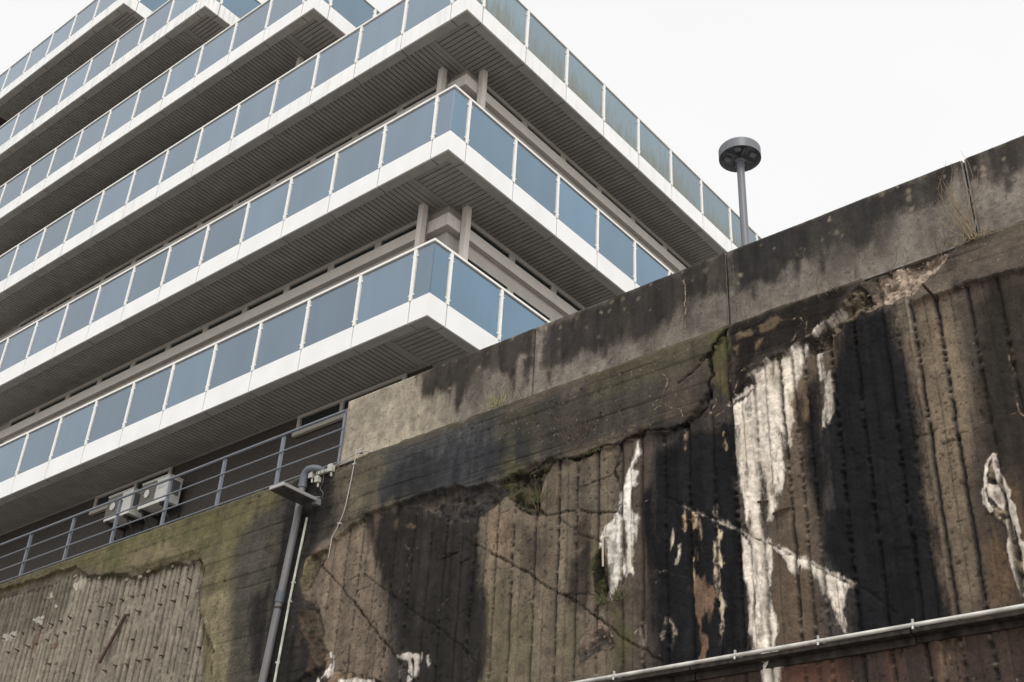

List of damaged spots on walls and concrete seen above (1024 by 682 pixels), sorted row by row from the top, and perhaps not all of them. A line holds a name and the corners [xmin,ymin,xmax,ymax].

water stain [966,136,1024,189]
water stain [417,182,921,412]
spalling [808,253,950,356]
crack [322,564,473,678]
water stain [359,437,505,682]
crack [441,540,540,582]
crack [562,594,663,662]
crack [528,329,737,528]
water stain [568,288,951,682]
spalling [987,461,1024,598]